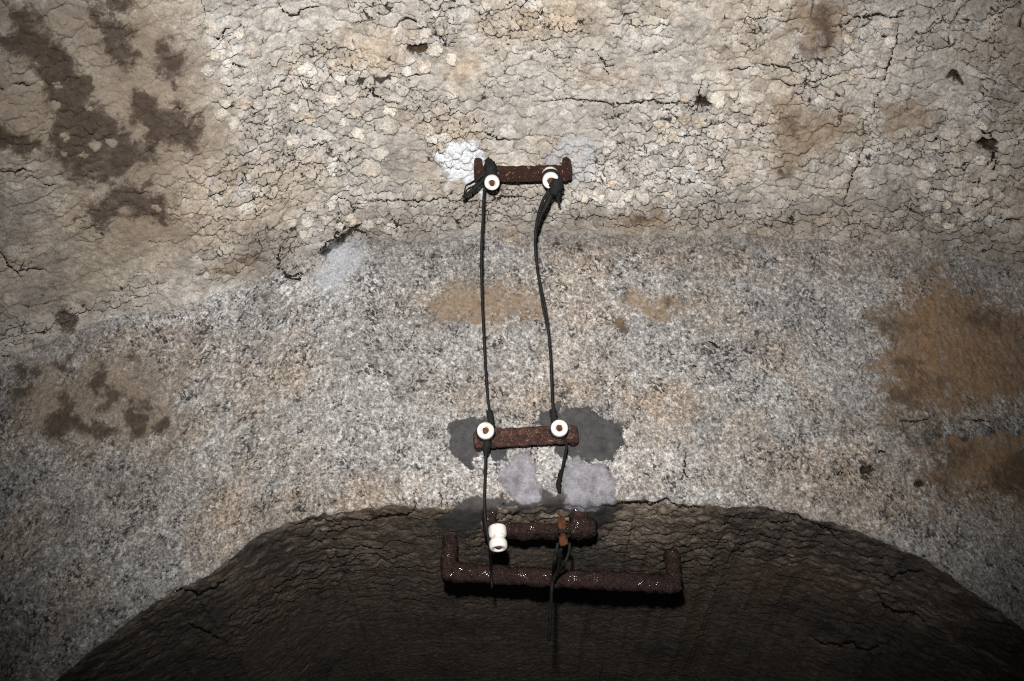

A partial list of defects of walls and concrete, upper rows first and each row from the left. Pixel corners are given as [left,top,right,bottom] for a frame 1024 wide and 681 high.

crack [279,3,319,17]
leakage [0,0,205,231]
crack [345,87,399,116]
crack [540,53,709,108]
crack [728,63,836,89]
crack [835,10,905,115]
crack [843,145,865,202]
crack [952,130,1010,207]
crack [319,197,460,251]
crack [276,245,306,281]
leakage [9,364,42,397]
leakage [42,370,170,440]